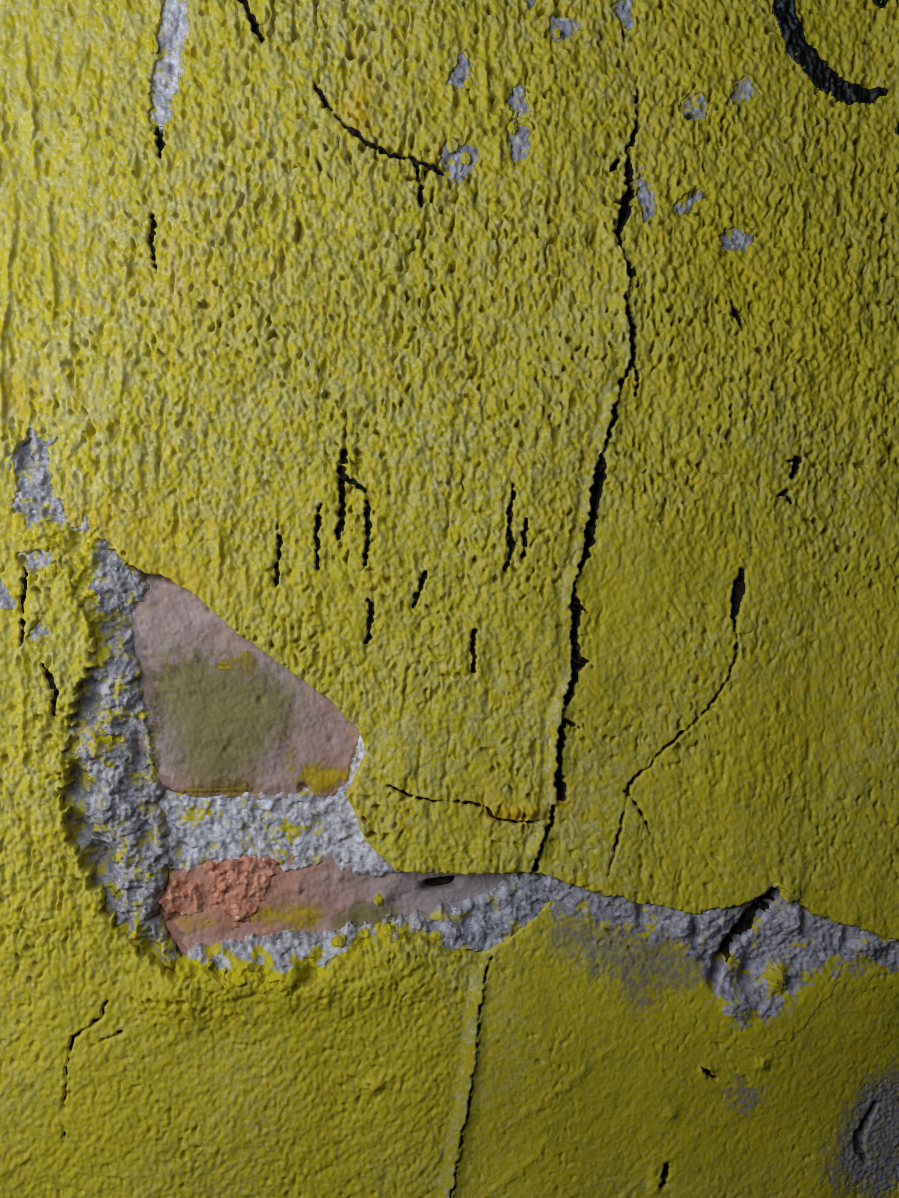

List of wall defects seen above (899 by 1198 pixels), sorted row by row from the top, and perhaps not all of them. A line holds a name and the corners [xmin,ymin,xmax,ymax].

peeling [147,0,191,159]
crack [314,84,444,208]
peeling [436,138,481,186]
peeling [447,54,473,91]
peeling [506,84,532,167]
peeling [549,15,581,42]
peeling [628,165,657,223]
peeling [713,228,754,252]
crack [387,89,639,873]
flaking render [0,422,899,1052]
crack [609,568,746,866]
crack [450,956,492,1198]